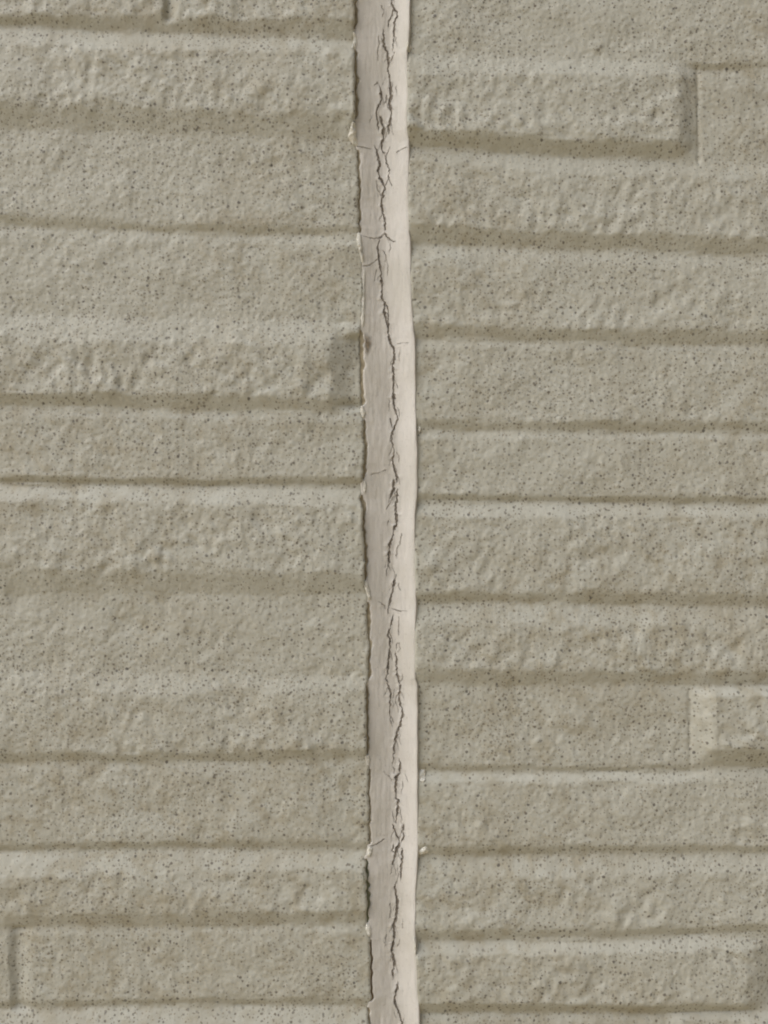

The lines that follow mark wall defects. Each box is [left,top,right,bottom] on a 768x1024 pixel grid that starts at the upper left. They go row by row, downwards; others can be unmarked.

crack [357,0,408,1024]